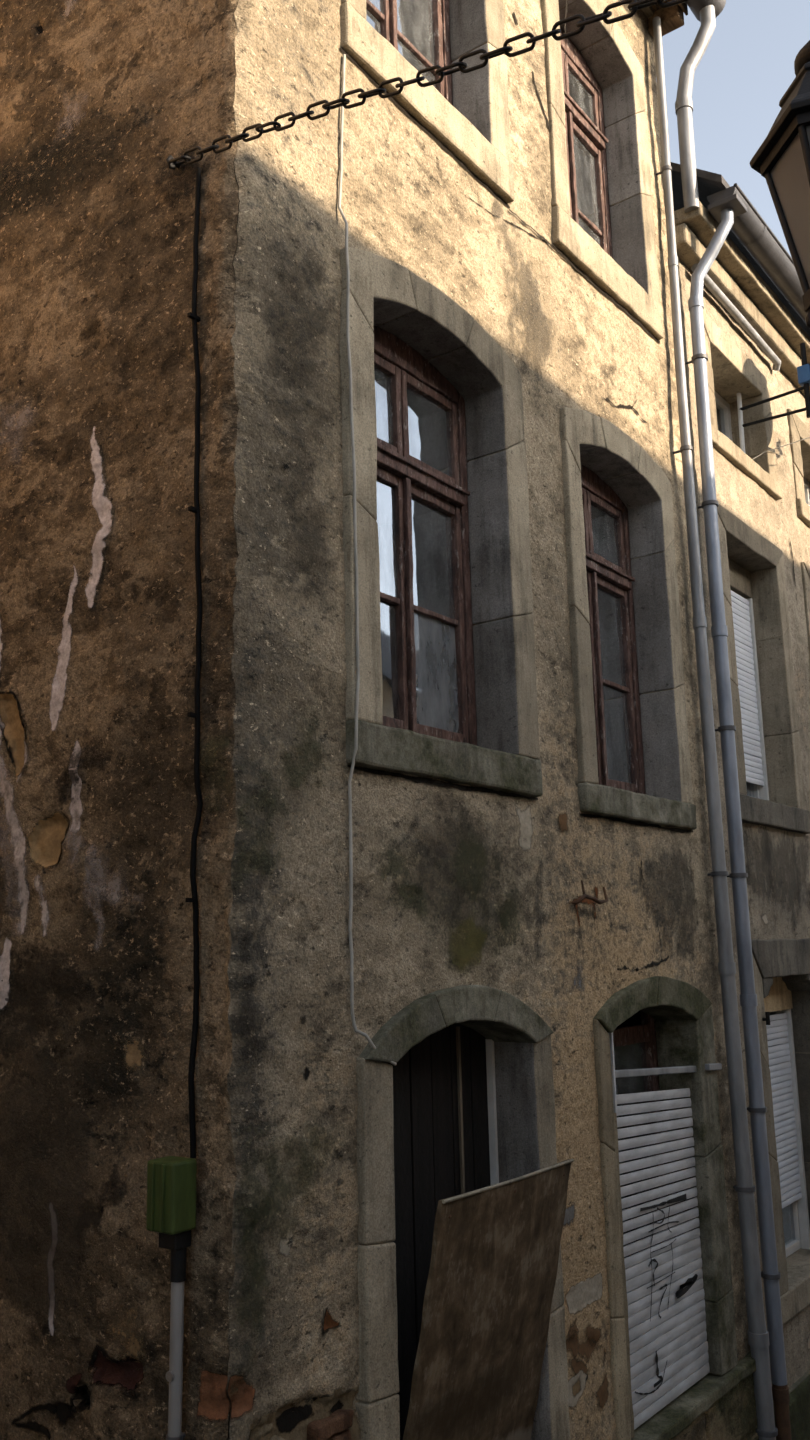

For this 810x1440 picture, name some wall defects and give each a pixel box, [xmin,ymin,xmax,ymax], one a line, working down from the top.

spalling [0,691,28,776]
spalling [27,812,69,868]
leakage [450,828,543,969]
crack [13,1402,77,1425]
spalling [197,1370,360,1440]